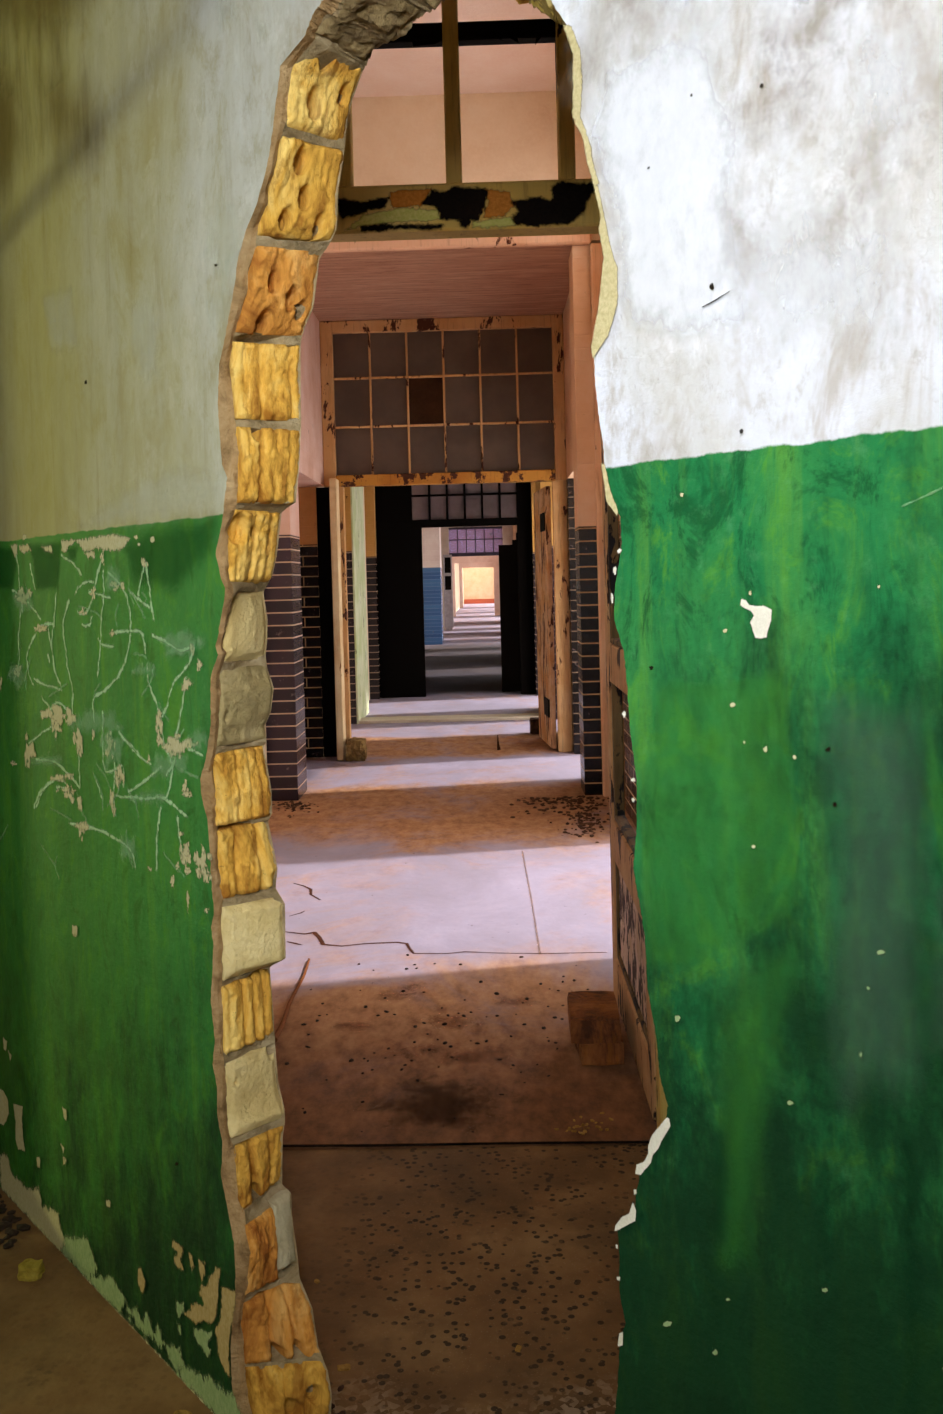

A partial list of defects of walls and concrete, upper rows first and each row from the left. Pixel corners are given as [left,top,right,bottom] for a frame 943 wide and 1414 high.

flaking render [338,25,618,357]
flaking render [602,464,618,516]
peeling [11,534,155,567]
peeling [740,591,772,639]
peeling [182,644,202,691]
peeling [41,704,125,816]
peeling [147,710,198,762]
peeling [50,773,89,841]
peeling [170,831,212,907]
crack [285,883,605,954]
flaking render [615,1118,670,1249]
peeling [0,1089,240,1414]